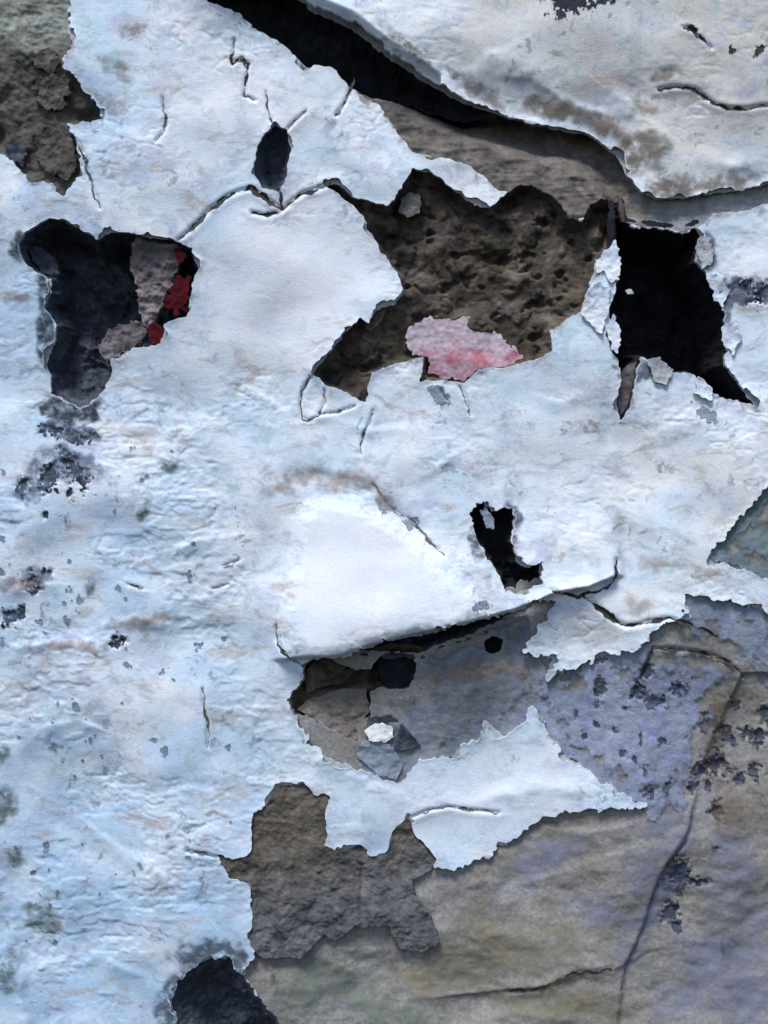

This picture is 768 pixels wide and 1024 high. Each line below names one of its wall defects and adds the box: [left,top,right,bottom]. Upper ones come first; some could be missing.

peeling [0,0,101,196]
crack [229,40,305,129]
crack [657,86,768,111]
crack [75,139,101,208]
crack [179,182,331,239]
spalling [254,126,291,191]
spalling [314,170,625,402]
peeling [695,236,729,311]
peeling [709,487,768,579]
peeling [218,503,768,1024]
crack [417,805,498,816]
crack [508,815,692,993]